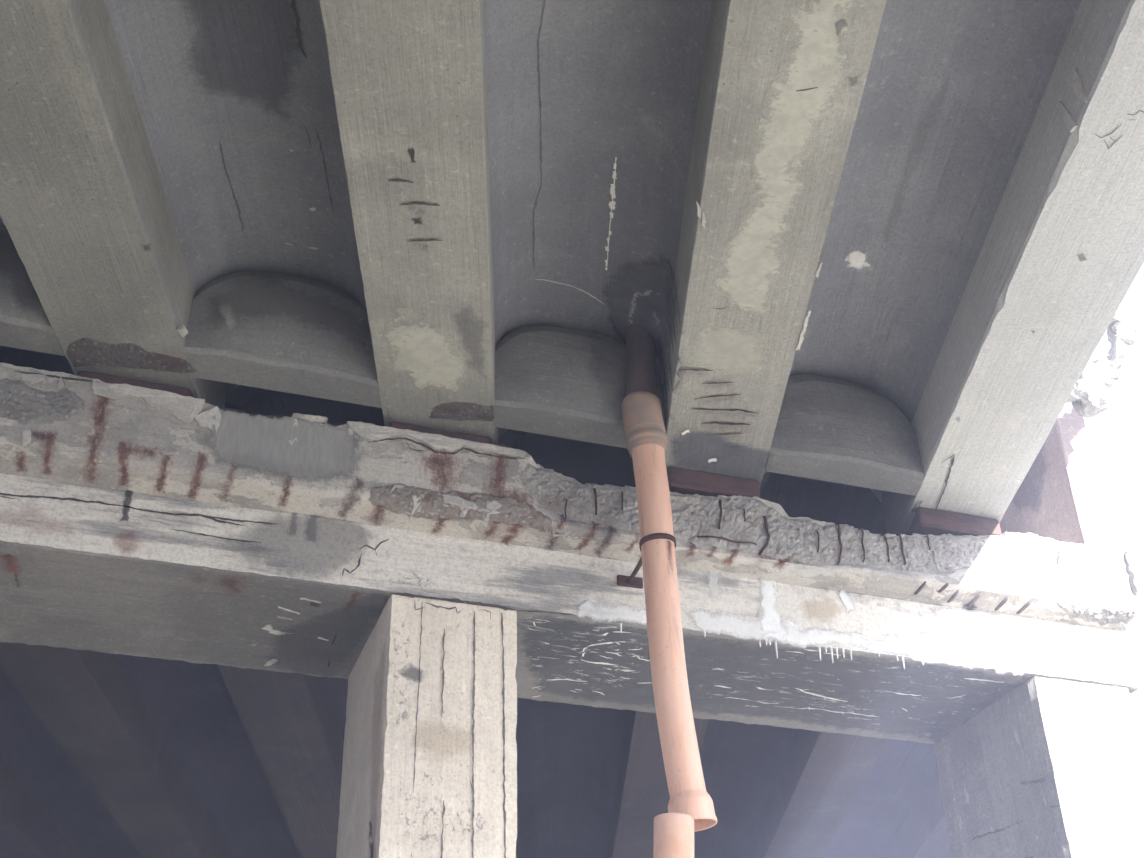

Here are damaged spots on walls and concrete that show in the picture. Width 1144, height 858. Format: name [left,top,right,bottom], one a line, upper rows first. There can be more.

water stain [712,0,857,318]
spalling [66,337,197,373]
corrosion [85,395,109,483]
crack [0,493,276,543]
corrosion [118,442,170,492]
corrosion [188,454,207,499]
peeling [0,368,640,537]
crack [683,369,759,447]
spalling [670,492,1055,603]
water stain [521,600,655,705]
water stain [683,579,1052,742]
crack [392,593,650,858]